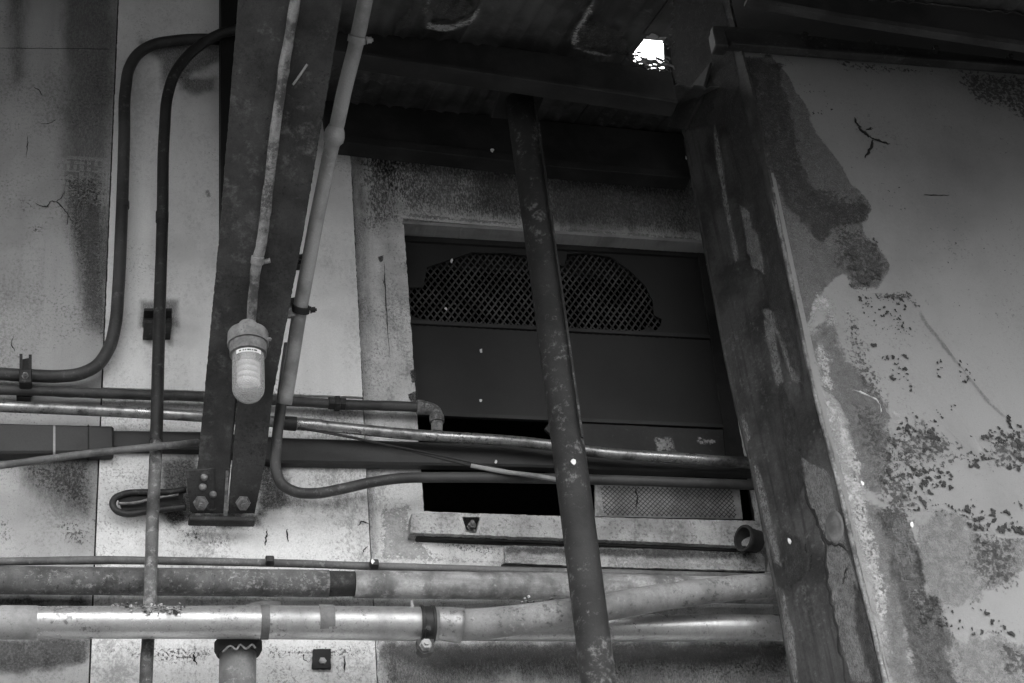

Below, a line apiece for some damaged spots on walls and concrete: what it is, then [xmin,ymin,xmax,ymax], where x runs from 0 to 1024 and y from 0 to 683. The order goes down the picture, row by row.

crack [36,191,73,224]
water stain [64,0,111,333]
peeling [714,127,764,273]
peeling [763,309,801,386]
peeling [801,345,890,683]
peeling [910,510,1024,606]
peeling [944,634,1024,683]